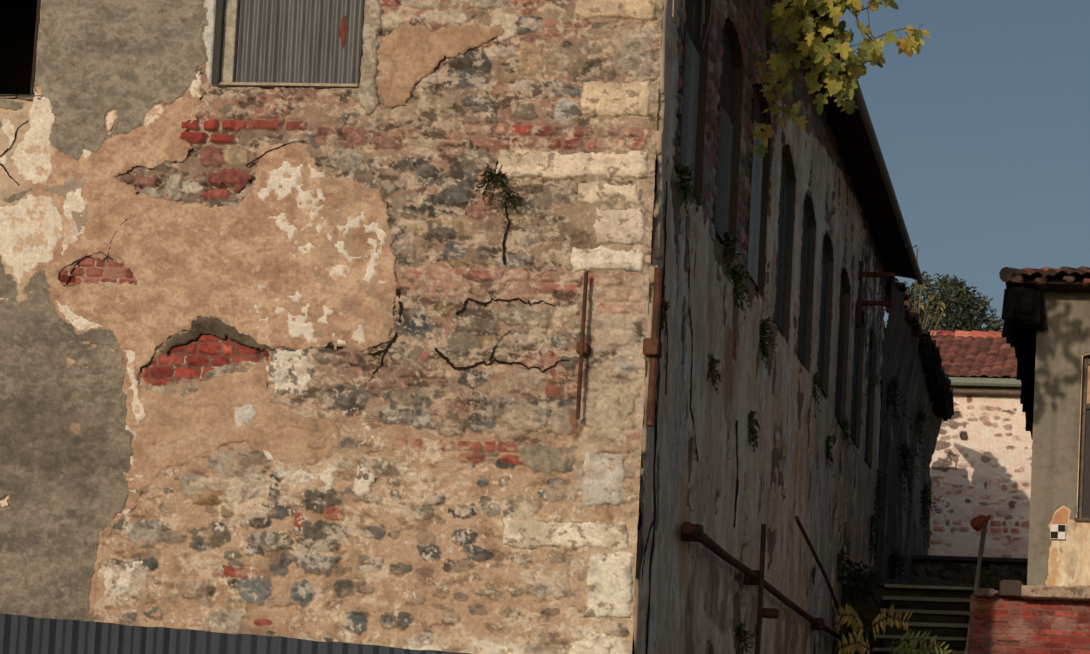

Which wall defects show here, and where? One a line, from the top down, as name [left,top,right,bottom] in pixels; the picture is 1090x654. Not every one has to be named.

corrosion [339,16,347,47]
crack [0,120,28,186]
crack [502,205,510,265]
crack [455,297,555,315]
peeling [0,71,397,618]
crack [435,330,570,373]
peeling [1047,508,1090,587]